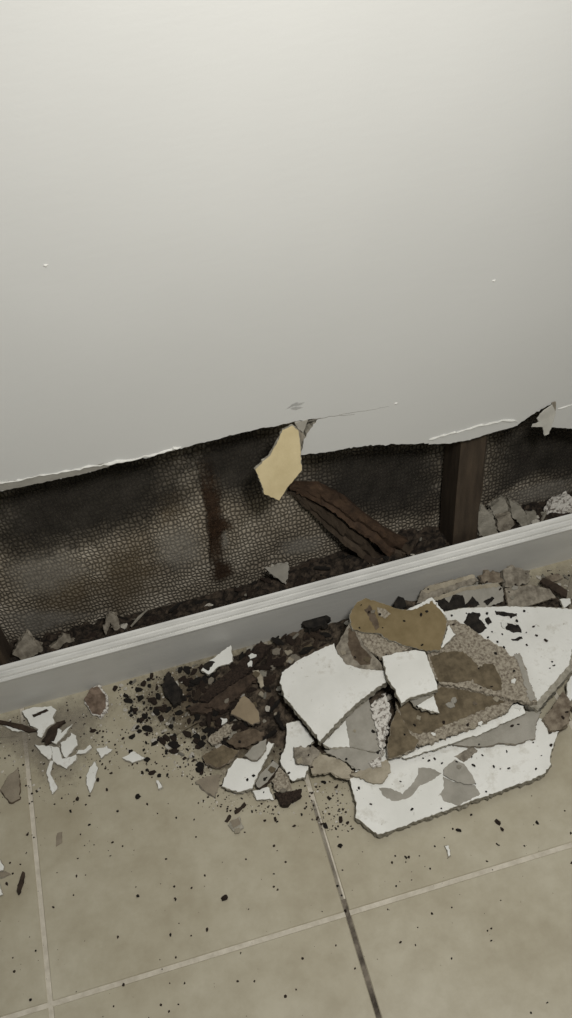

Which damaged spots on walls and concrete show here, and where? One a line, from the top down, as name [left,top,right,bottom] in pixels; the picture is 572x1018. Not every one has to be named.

damp [0,428,275,553]
spalling [0,401,572,644]
damp [316,443,441,514]
damp [491,414,572,494]